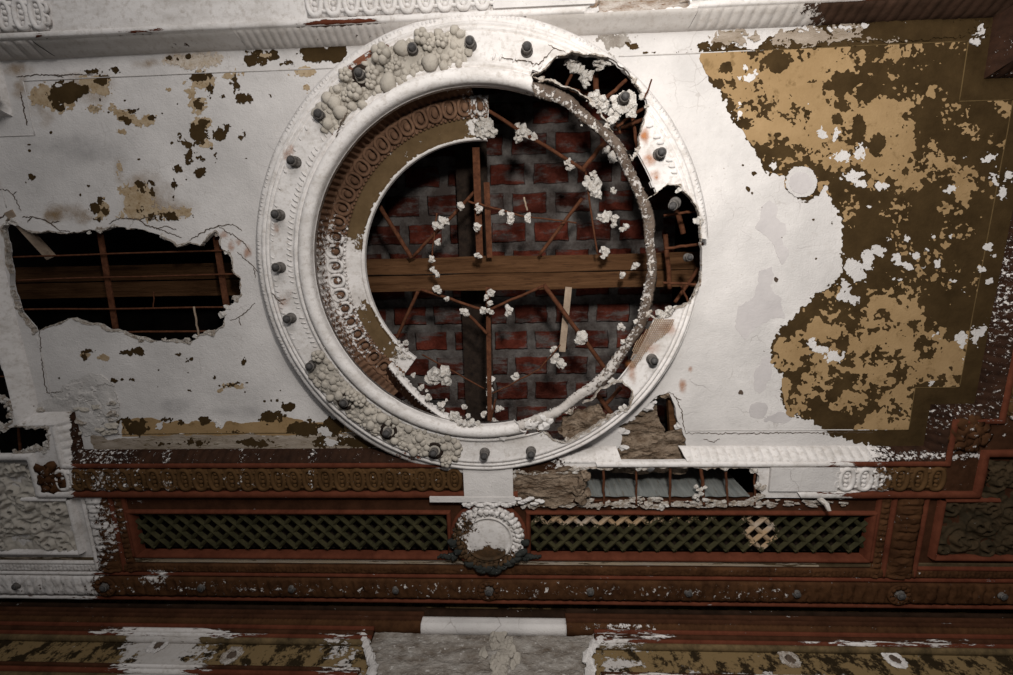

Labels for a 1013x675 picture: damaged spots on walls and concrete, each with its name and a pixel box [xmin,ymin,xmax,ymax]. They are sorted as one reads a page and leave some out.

flaking render [585,0,689,13]
flaking render [531,34,656,162]
crack [0,189,70,232]
flaking render [0,46,347,373]
flaking render [646,183,705,245]
peeling [676,17,1013,446]
crack [109,217,284,325]
flaking render [0,394,51,454]
peeling [90,390,378,450]
flaking render [513,377,767,511]
flaking render [360,629,606,675]
flaking render [881,653,908,669]